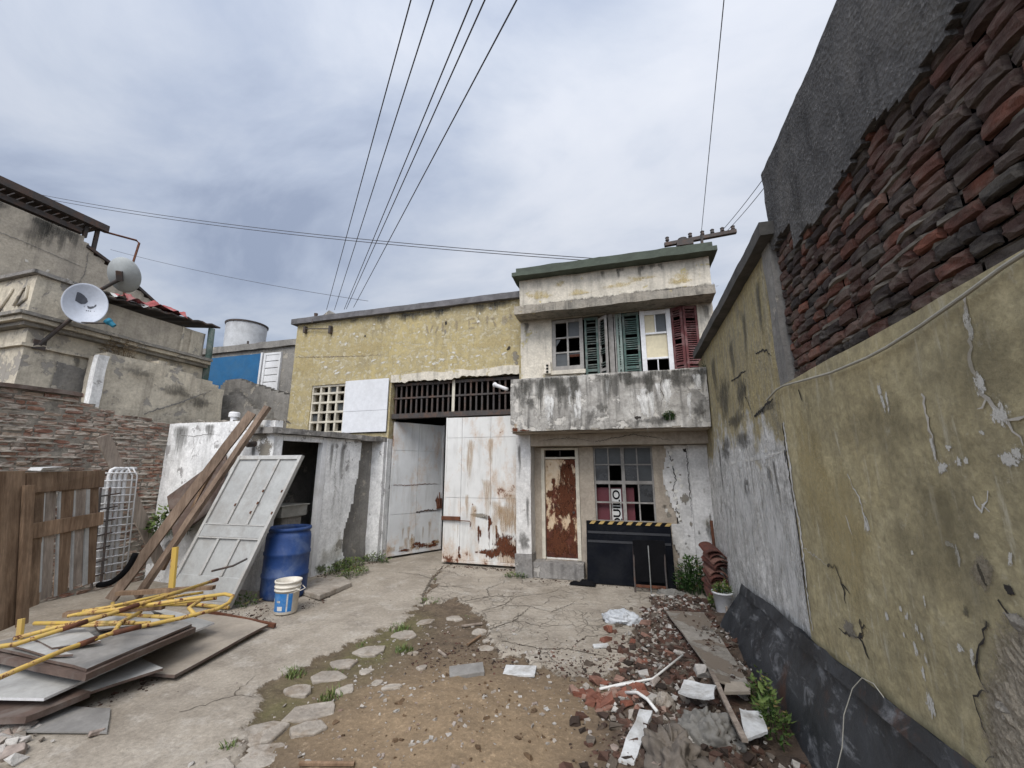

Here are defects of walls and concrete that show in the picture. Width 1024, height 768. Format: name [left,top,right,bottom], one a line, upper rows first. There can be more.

rust [399,540,439,552]
rust [475,515,516,559]
damp [514,376,581,419]
rust [545,459,578,558]
damp [596,359,802,627]
crack [731,349,869,659]
crack [921,393,968,474]
peeling [998,447,1024,467]